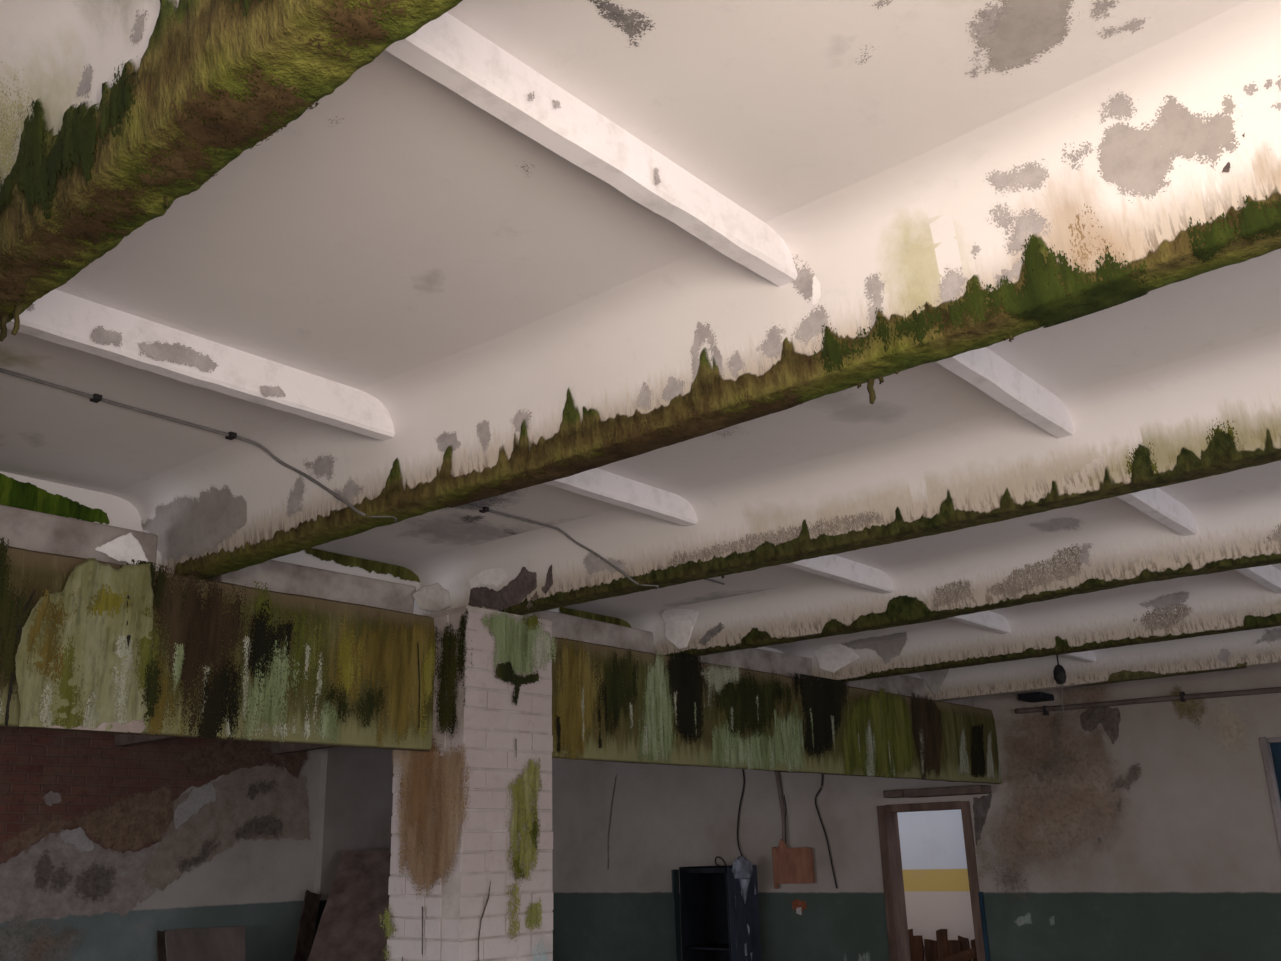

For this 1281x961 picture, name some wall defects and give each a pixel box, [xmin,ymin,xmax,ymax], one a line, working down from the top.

leakage [0,0,179,192]
peeling [965,0,1146,78]
peeling [1061,75,1281,203]
peeling [864,272,885,329]
leakage [865,196,983,320]
peeling [985,159,1052,287]
leakage [784,380,924,429]
peeling [141,484,247,562]
leakage [731,434,1122,548]
leakage [152,564,365,743]
leakage [636,622,850,772]
spalling [0,727,312,924]